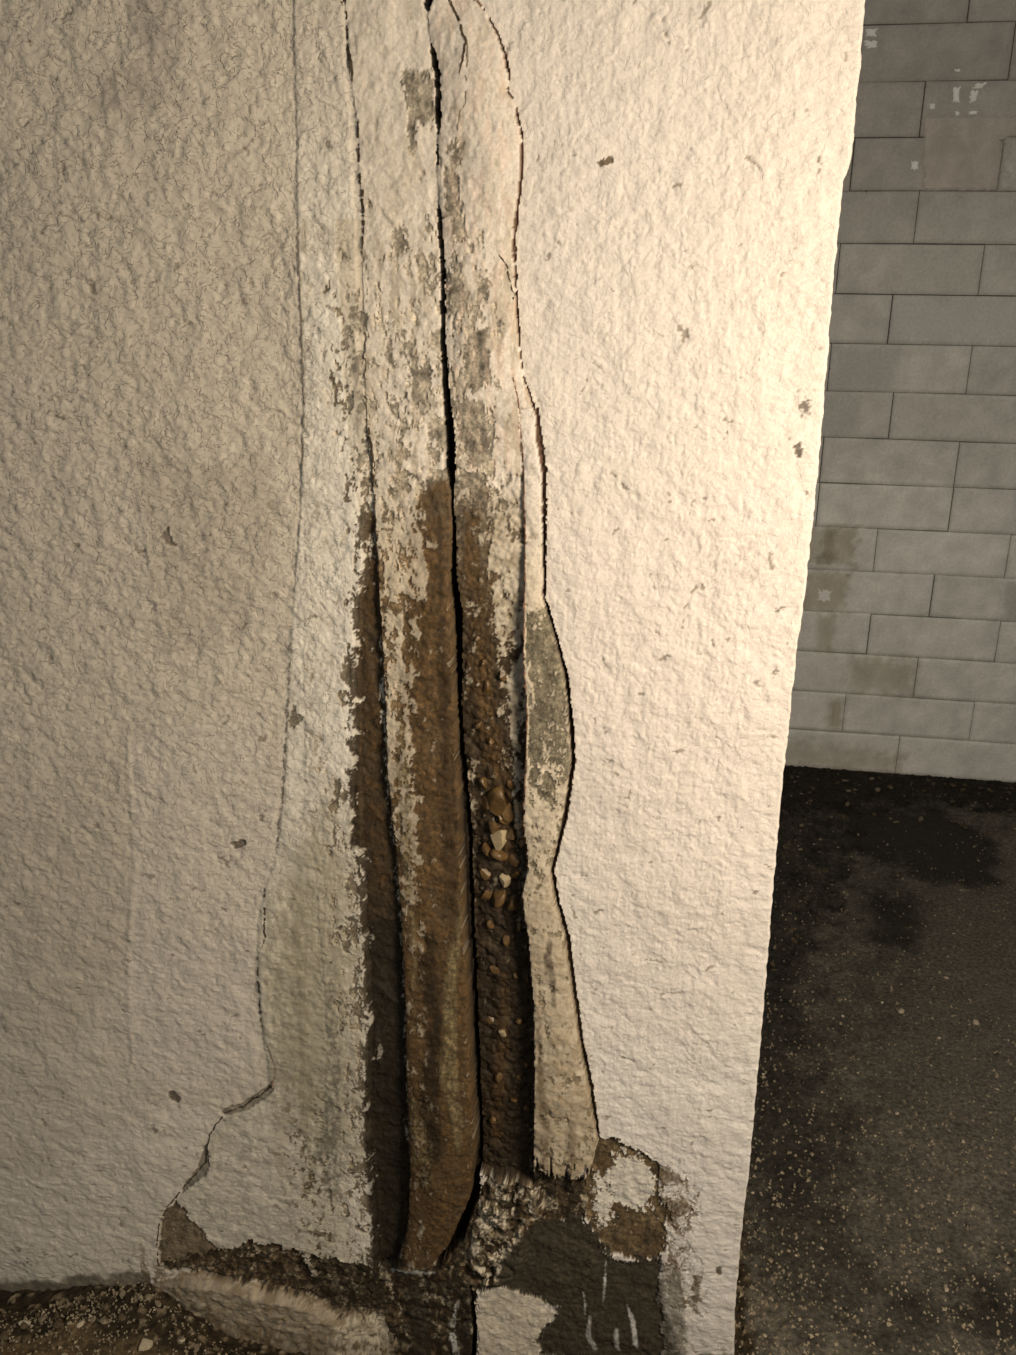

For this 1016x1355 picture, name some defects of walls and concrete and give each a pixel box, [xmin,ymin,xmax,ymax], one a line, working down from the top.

crack [156,889,277,1267]
crack [277,643,292,848]
crack [297,227,305,467]
crack [340,0,354,82]
crack [357,121,365,254]
crack [367,420,405,969]
damp [164,480,686,1355]
flaking render [159,0,723,1355]
crack [439,540,484,1261]
crack [423,0,600,1136]